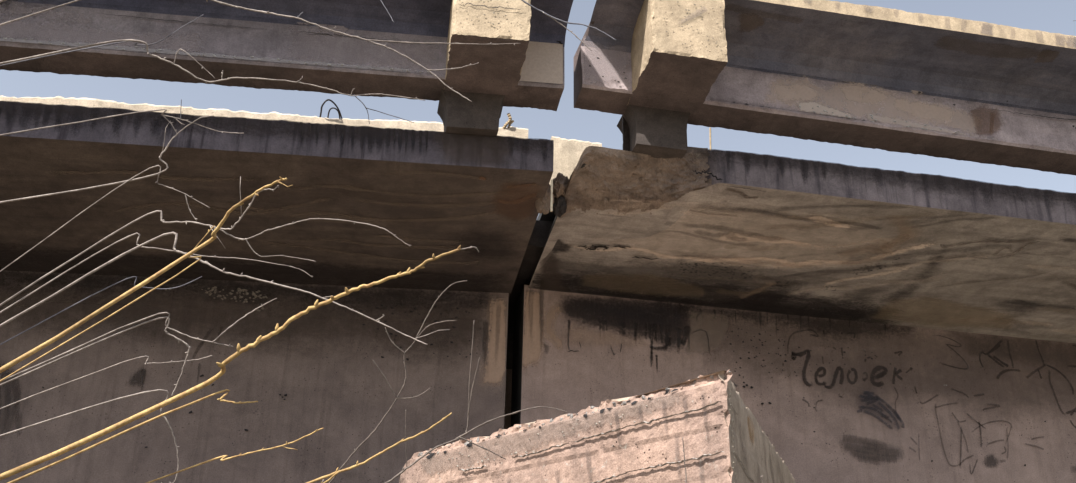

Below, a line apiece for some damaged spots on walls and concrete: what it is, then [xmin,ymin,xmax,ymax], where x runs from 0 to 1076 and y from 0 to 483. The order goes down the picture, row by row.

leakage [0,101,550,157]
spalling [560,127,711,218]
leakage [701,149,1076,202]
leakage [523,240,1033,369]
spalling [411,328,796,479]